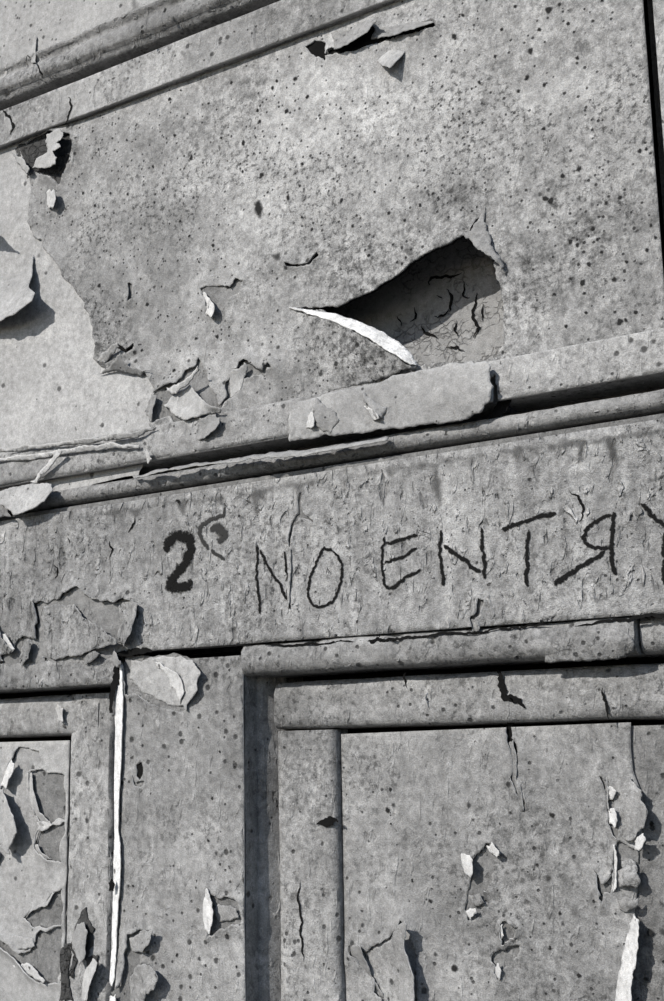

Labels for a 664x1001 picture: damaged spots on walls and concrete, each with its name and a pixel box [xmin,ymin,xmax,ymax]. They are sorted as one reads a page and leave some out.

peeling [306,19,435,68]
peeling [0,128,494,518]
peeling [286,493,313,615]
peeling [471,599,484,632]
crack [497,670,526,812]
peeling [0,587,201,1001]
peeling [316,816,338,827]
peeling [203,888,242,935]
peeling [349,921,417,1001]
peeling [461,842,500,920]
peeling [492,921,520,980]
peeling [598,776,648,1001]